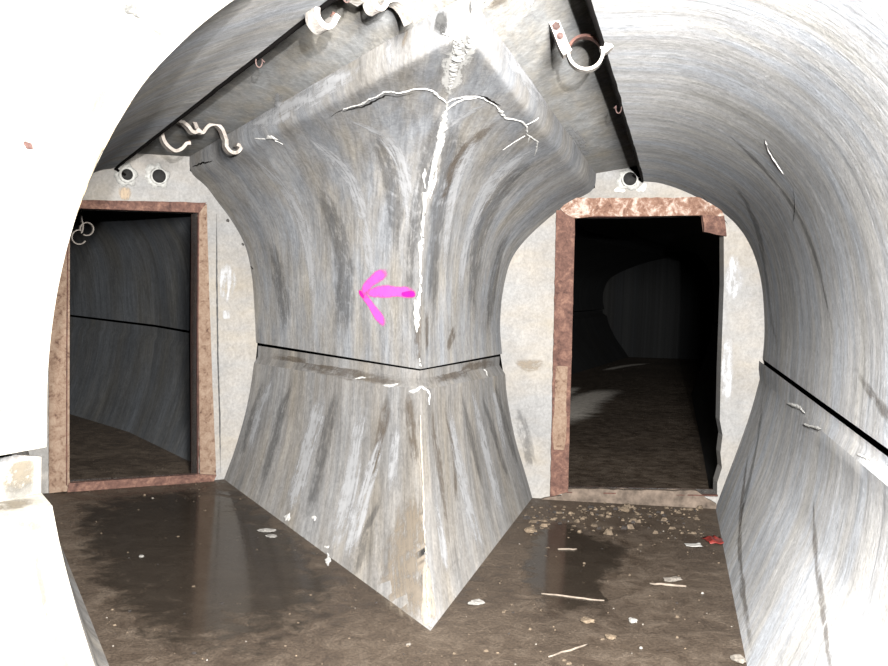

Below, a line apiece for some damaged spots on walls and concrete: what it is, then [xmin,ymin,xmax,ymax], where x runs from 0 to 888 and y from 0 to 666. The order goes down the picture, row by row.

damp [259,163,314,289]
damp [253,73,350,145]
damp [314,143,374,273]
damp [360,0,493,332]
crack [331,88,539,156]